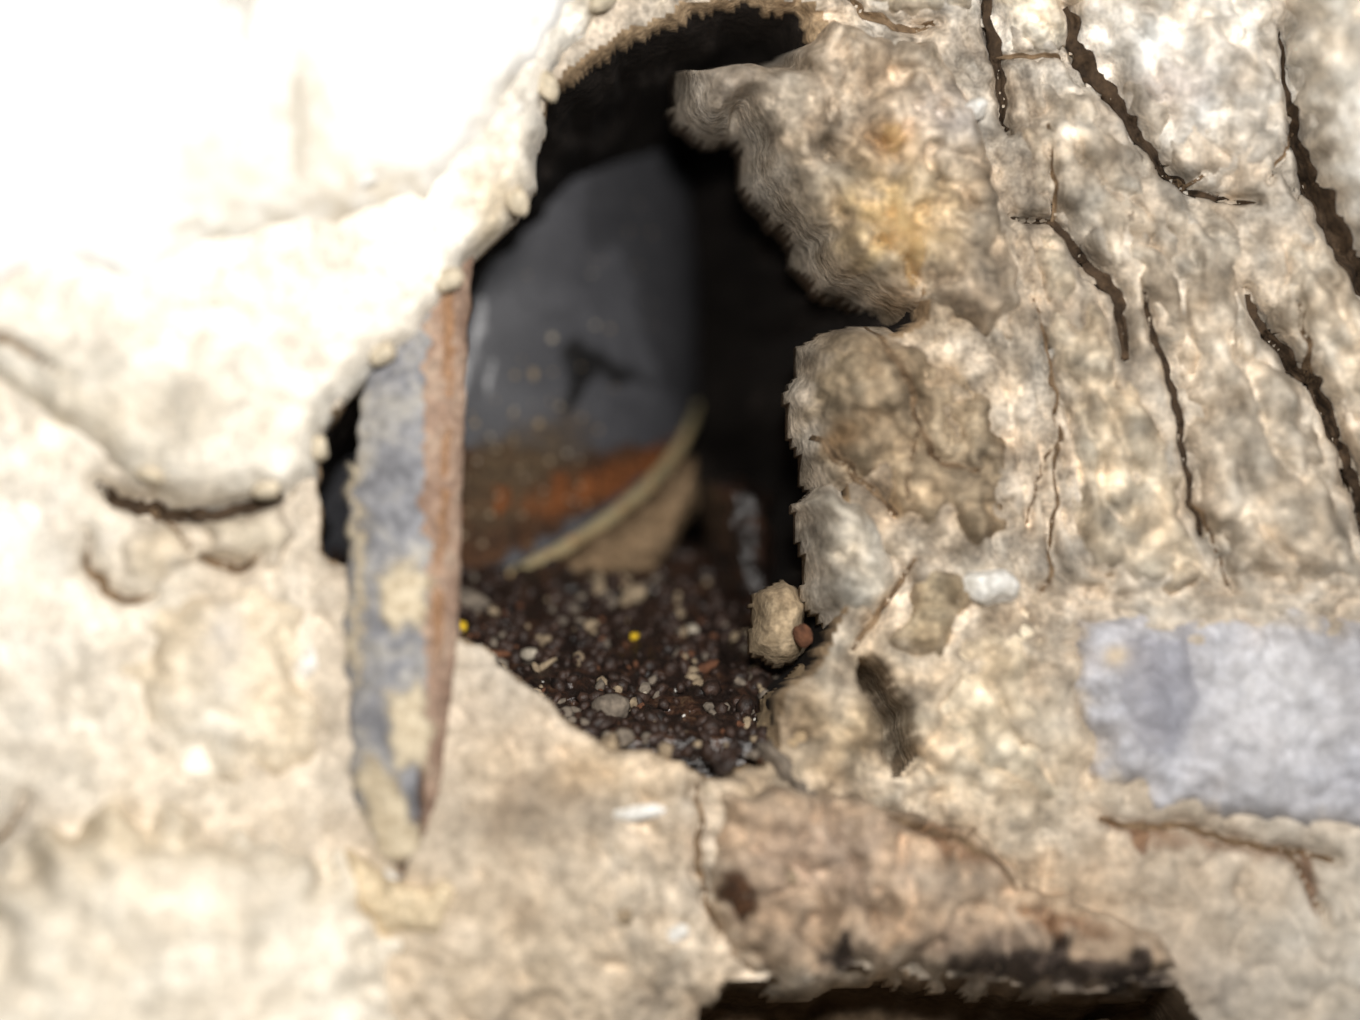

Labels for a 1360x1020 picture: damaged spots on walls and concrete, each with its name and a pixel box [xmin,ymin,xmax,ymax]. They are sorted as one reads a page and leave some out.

crack [981,0,1360,296]
peeling [251,482,280,499]
spalling [313,392,363,567]
corrosion [409,256,680,838]
spalling [435,0,1021,748]
spalling [874,0,1360,595]
crack [1010,123,1231,595]
crack [1245,294,1360,533]
spalling [120,586,320,784]
spalling [889,570,1060,801]
corrosion [394,855,411,874]
spalling [613,803,667,822]